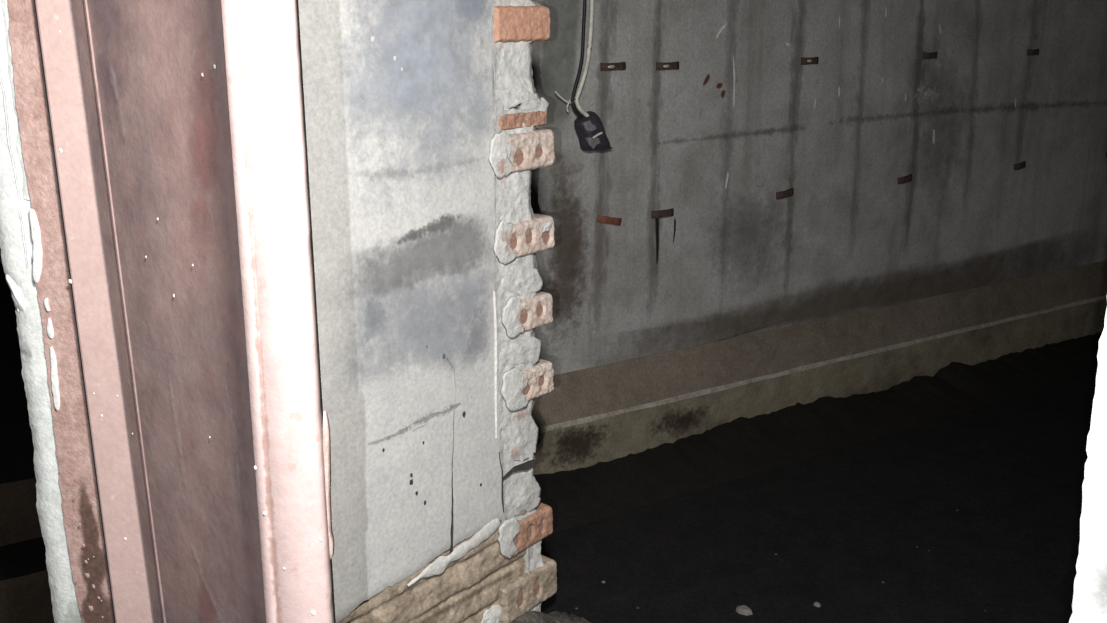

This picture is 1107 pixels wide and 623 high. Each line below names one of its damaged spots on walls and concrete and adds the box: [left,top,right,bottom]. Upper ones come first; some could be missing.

spalling [337,0,557,623]
leakage [550,180,584,324]
leakage [667,244,1062,346]
leakage [552,426,601,463]
leakage [658,410,703,432]
corrosion [80,484,114,623]